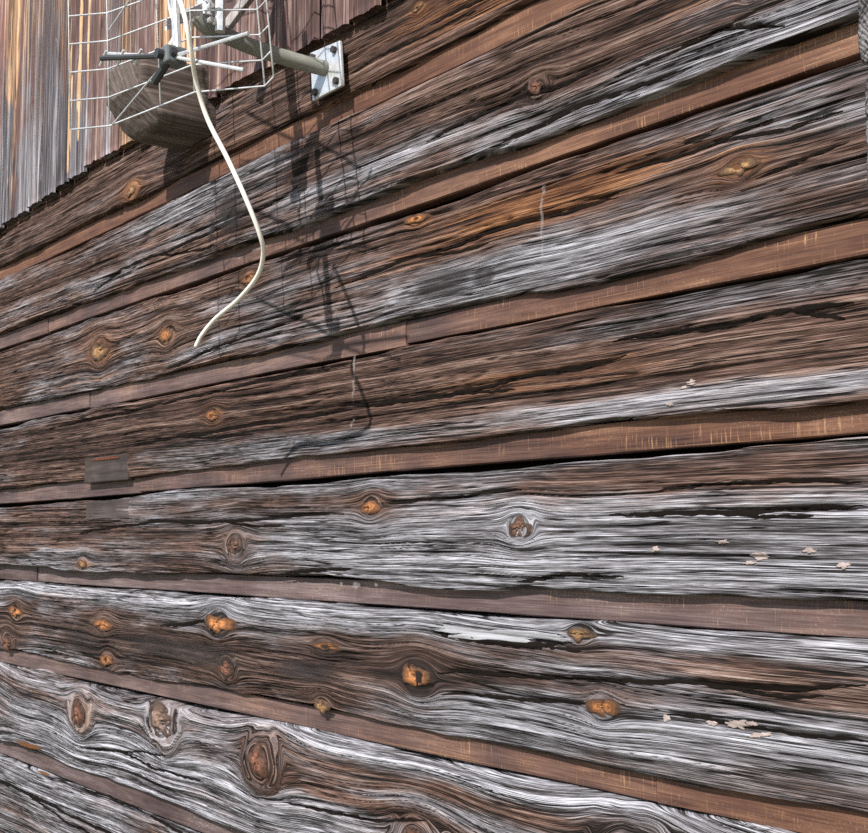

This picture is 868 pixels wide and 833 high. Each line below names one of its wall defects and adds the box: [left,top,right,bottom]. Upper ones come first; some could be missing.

crack [430,629,581,652]
crack [439,670,863,704]